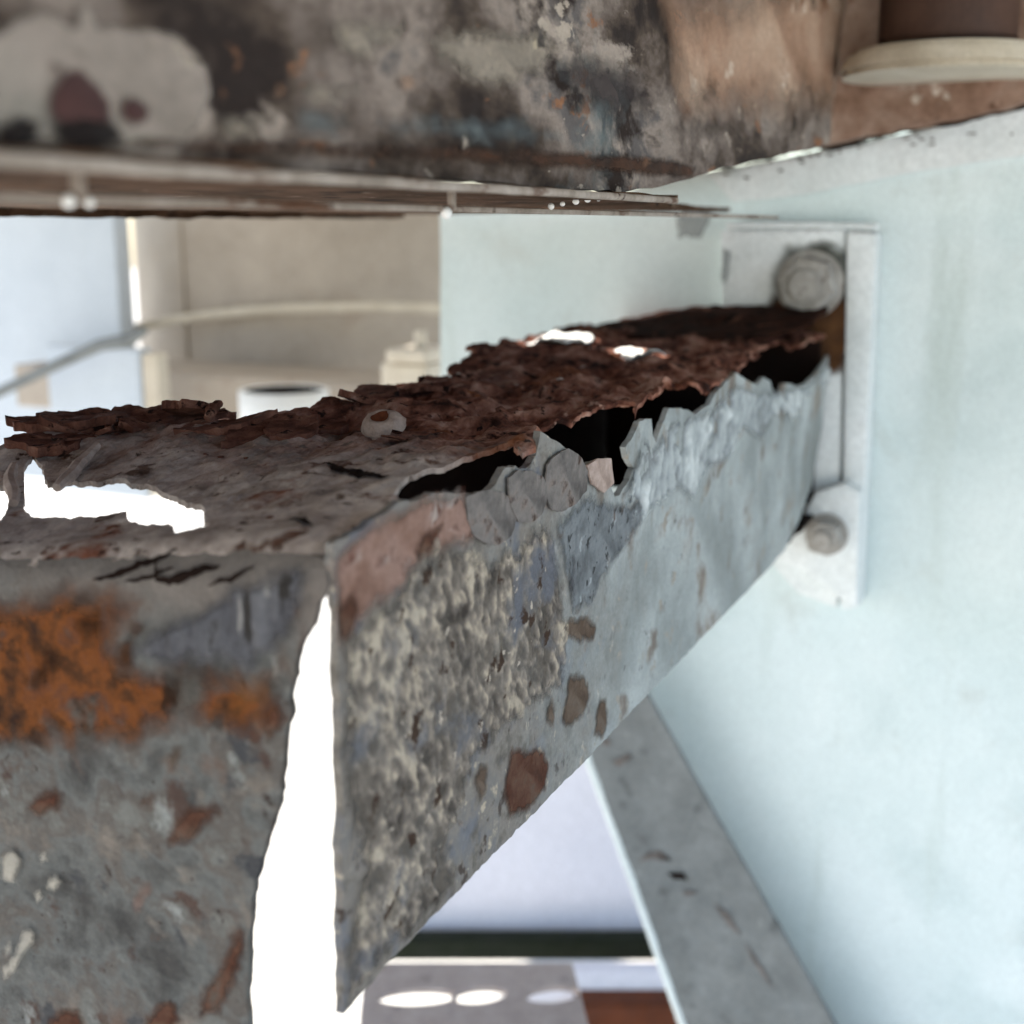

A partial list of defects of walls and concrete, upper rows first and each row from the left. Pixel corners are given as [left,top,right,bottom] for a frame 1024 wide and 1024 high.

rust [338,332,549,405]
rust [606,360,637,369]
rust [804,296,846,373]
rust [4,399,349,459]
peeling [558,367,830,612]
rust [567,617,596,643]
rust [0,595,281,746]
rust [548,676,607,738]
rust [505,749,549,815]